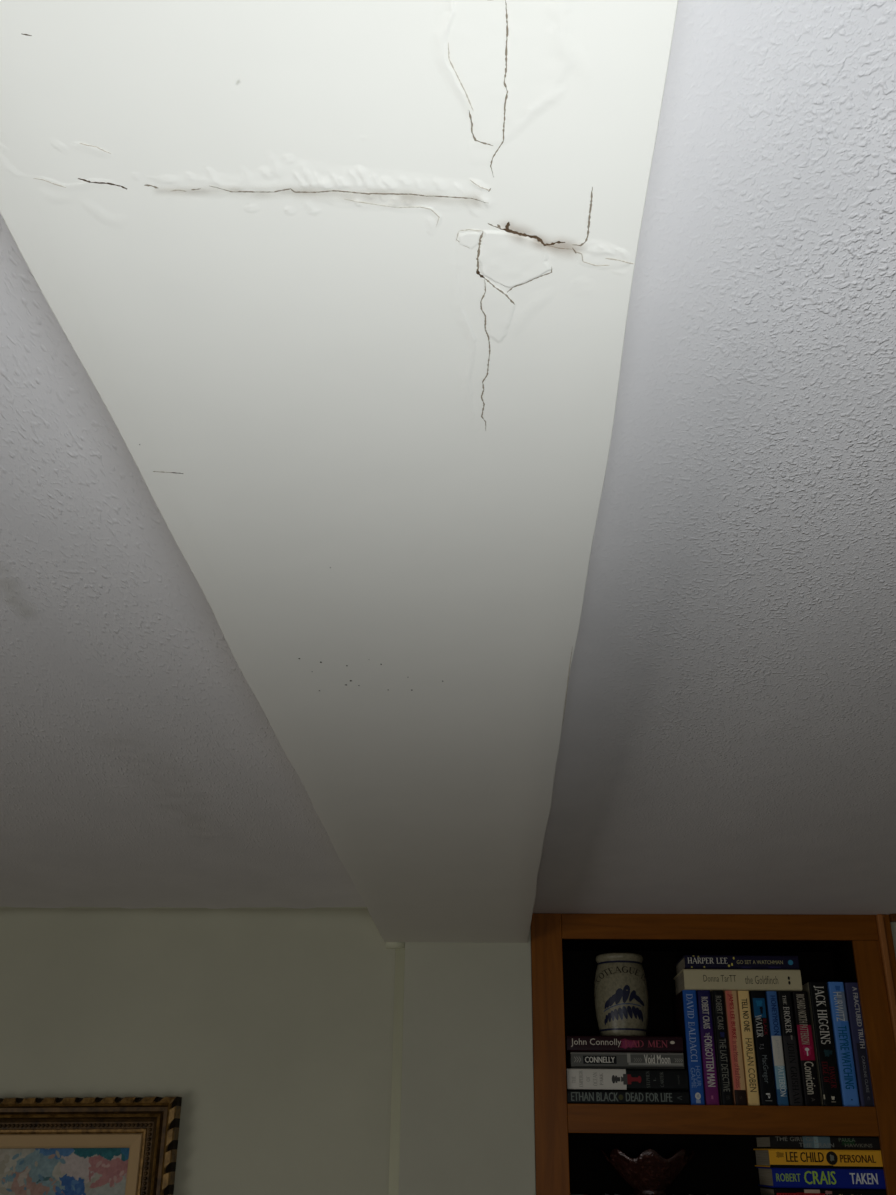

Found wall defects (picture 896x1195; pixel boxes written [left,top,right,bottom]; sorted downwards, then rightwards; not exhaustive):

crack [33,0,633,430]